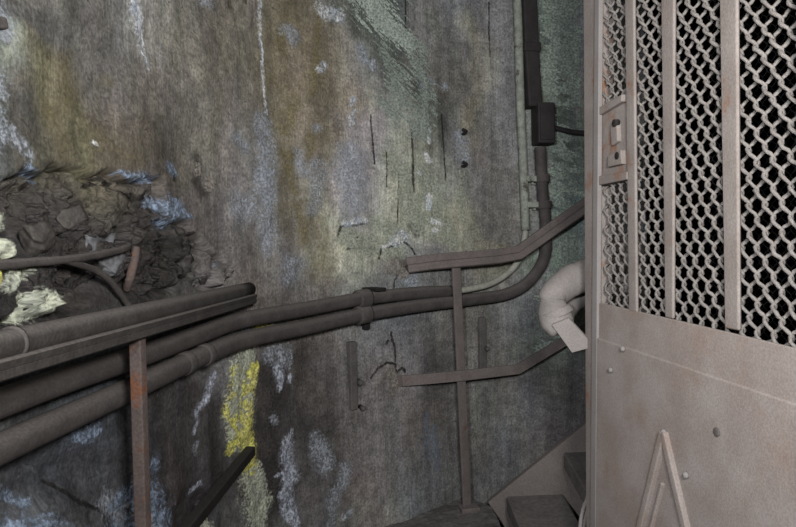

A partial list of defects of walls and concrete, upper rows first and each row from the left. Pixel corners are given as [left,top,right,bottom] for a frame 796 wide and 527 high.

damp [130,0,149,70]
damp [318,4,344,22]
damp [426,193,442,232]
crack [370,332,406,399]